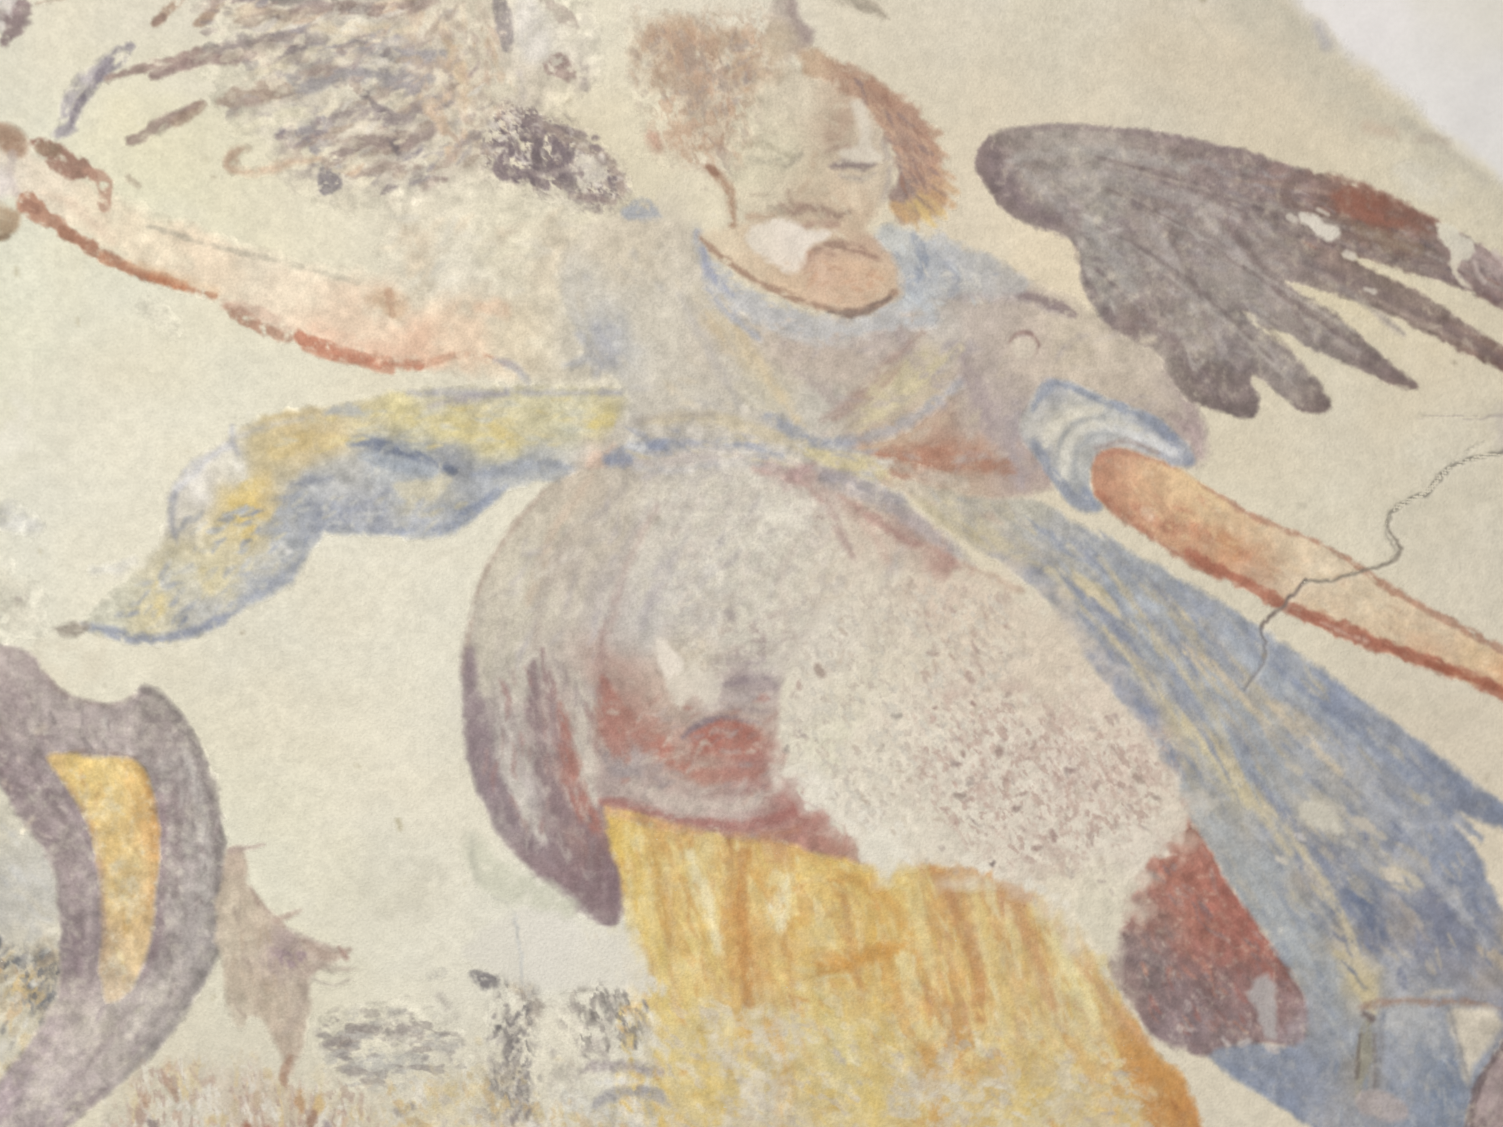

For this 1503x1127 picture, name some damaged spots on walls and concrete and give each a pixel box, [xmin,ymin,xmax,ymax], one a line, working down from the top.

crack [1242,413,1503,694]